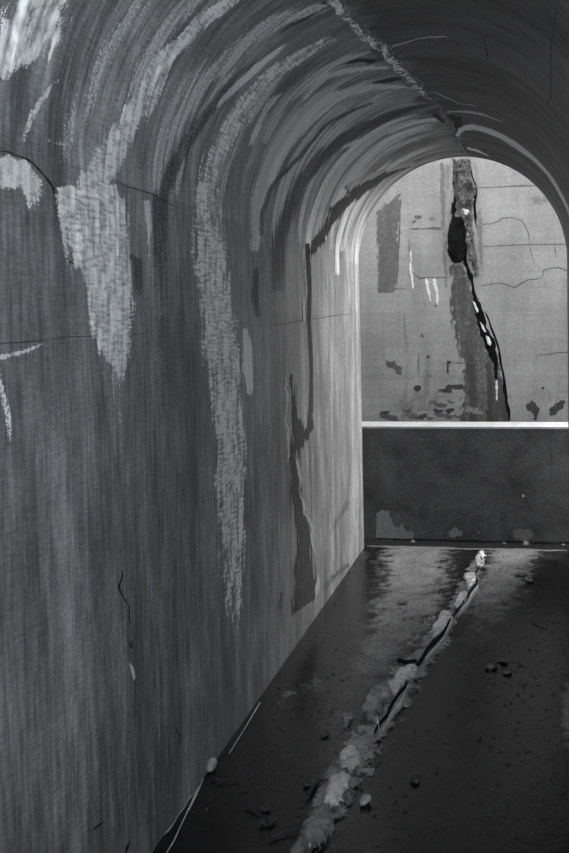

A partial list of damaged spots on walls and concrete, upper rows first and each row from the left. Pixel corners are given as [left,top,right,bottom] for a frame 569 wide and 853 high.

crack [1,151,55,195]
crack [325,0,567,422]
water stain [446,110,569,215]
crack [0,335,104,344]
water stain [0,0,451,628]
spalling [525,400,565,420]
crack [374,550,483,734]